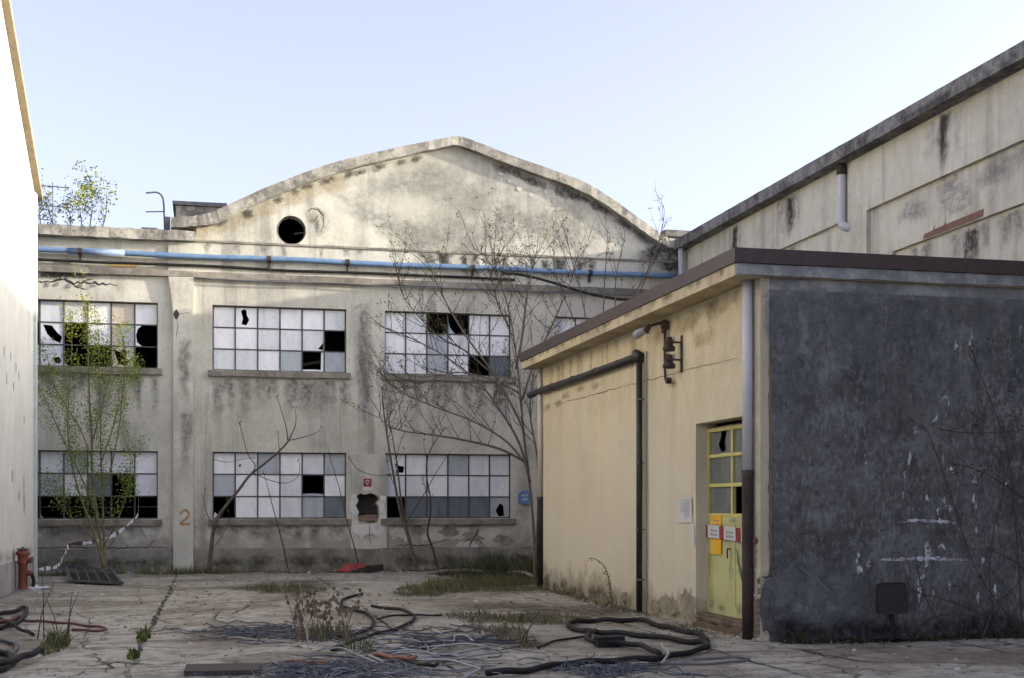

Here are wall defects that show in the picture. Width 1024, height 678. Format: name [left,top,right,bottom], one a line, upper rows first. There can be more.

water stain [930,114,957,152]
water stain [954,227,978,259]
crack [39,273,117,290]
crack [551,358,737,405]
flaking render [350,494,515,547]
crack [36,582,276,674]
flaking render [648,586,696,640]